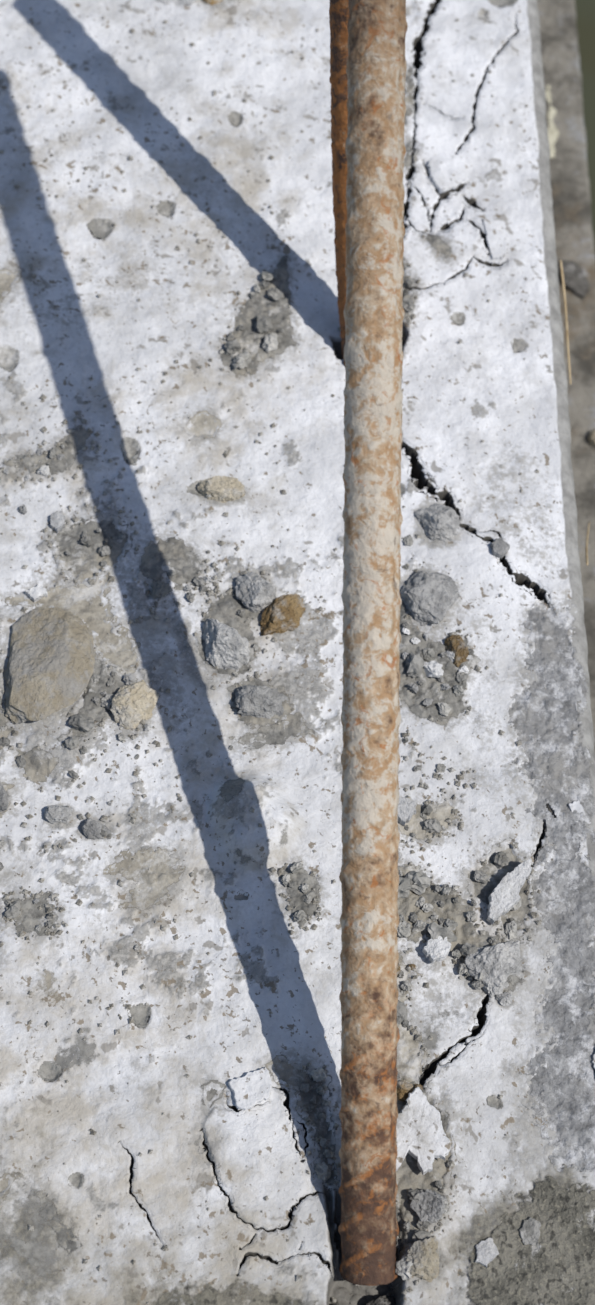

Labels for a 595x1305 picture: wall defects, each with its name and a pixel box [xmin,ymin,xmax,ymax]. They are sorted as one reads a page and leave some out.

crack [403,0,521,292]
spalling [183,411,224,439]
crack [401,438,550,607]
spalling [197,0,595,1291]
crack [530,805,555,867]
crack [419,994,492,1091]
water stain [153,1279,302,1305]
water stain [459,1176,595,1305]